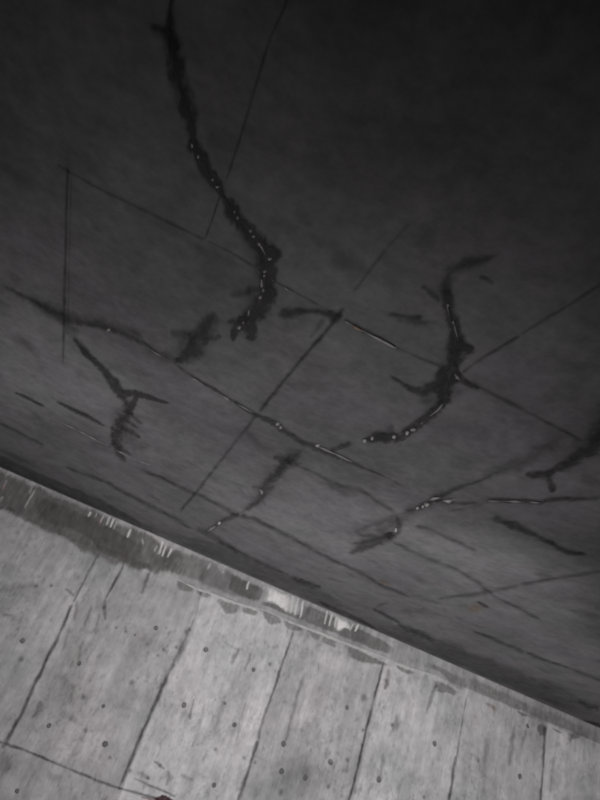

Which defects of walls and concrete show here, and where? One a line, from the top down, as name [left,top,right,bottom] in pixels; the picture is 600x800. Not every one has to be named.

crack [153,0,293,341]
crack [16,321,168,459]
crack [178,285,479,506]
crack [490,433,600,504]
water stain [0,474,172,571]
water stain [496,518,585,556]
water stain [267,589,304,618]
water stain [323,603,375,631]